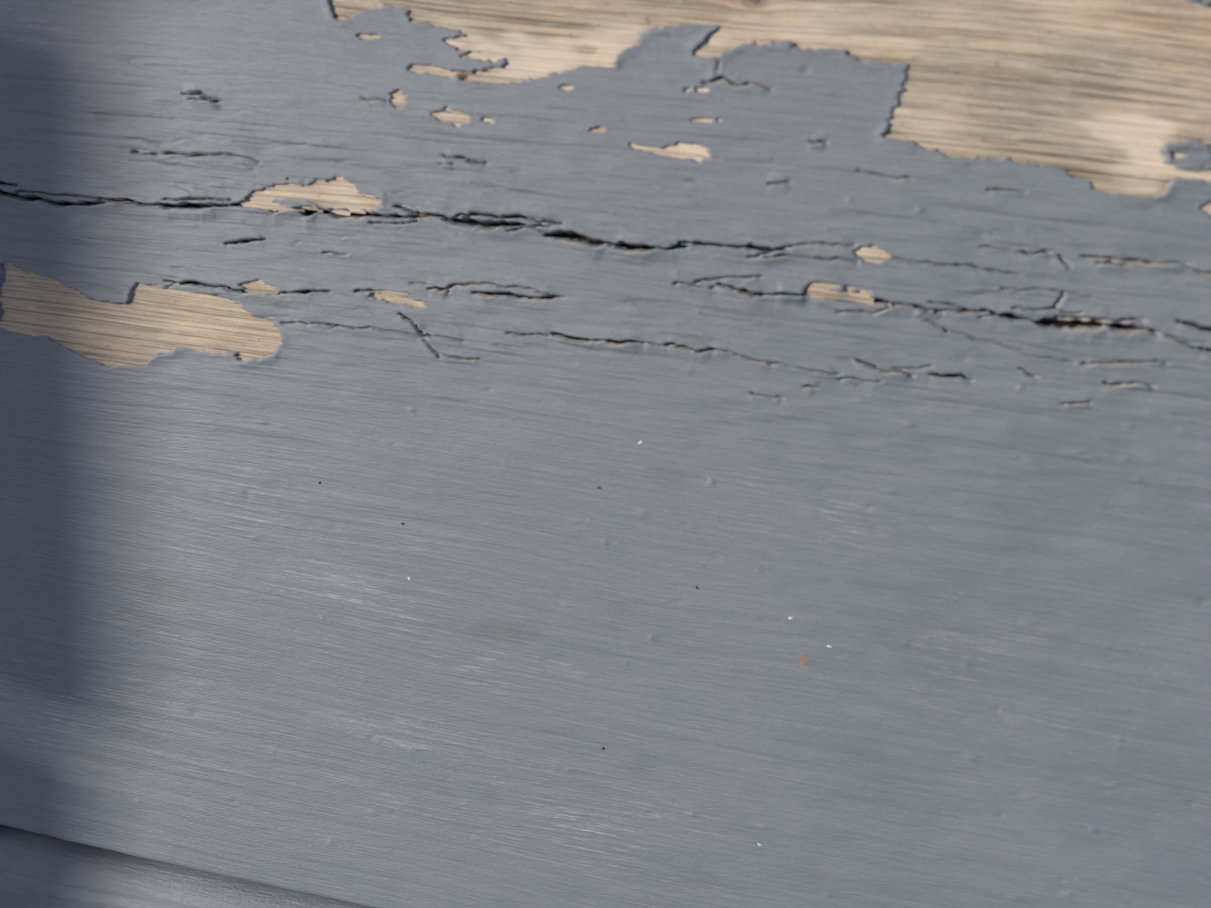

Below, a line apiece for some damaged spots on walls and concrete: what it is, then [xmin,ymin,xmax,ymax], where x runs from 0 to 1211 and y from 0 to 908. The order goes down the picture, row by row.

peeling [331,0,1211,197]
crack [0,181,243,209]
peeling [241,177,381,216]
crack [230,237,266,245]
crack [305,206,857,296]
peeling [0,263,282,367]
crack [167,280,247,293]
crack [278,290,481,360]
crack [416,282,557,299]
peeling [804,282,874,303]
crack [838,246,1211,404]
crack [509,332,971,398]